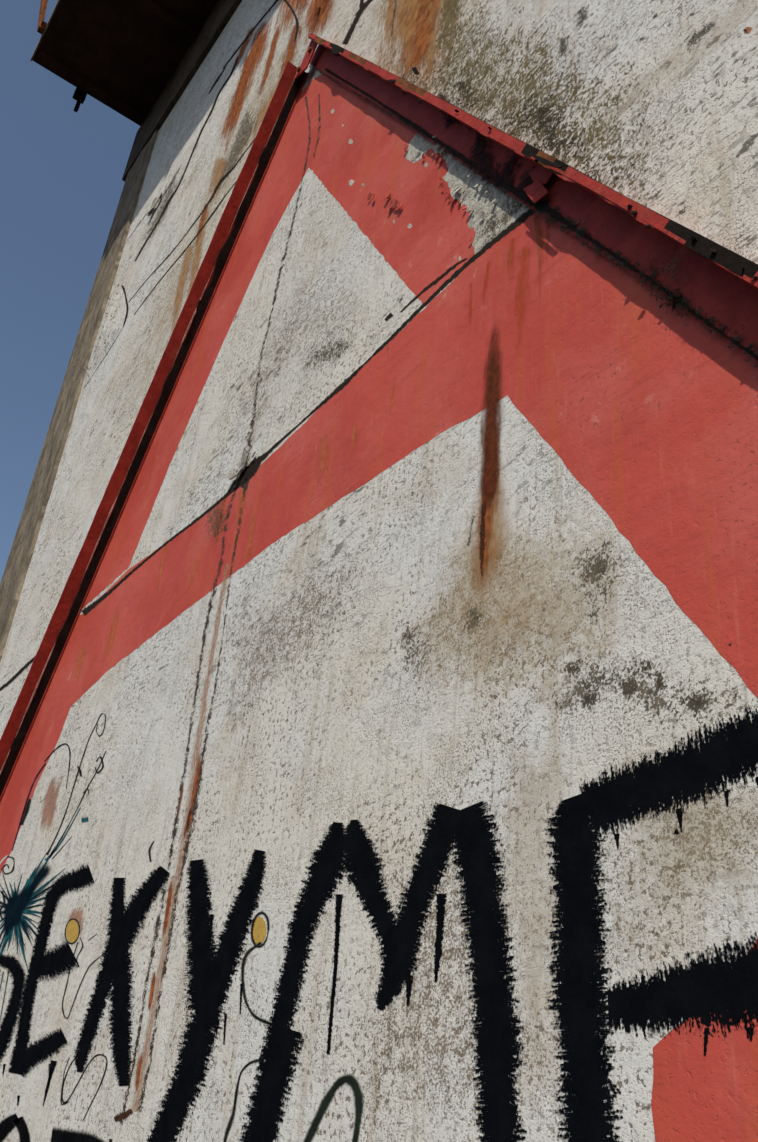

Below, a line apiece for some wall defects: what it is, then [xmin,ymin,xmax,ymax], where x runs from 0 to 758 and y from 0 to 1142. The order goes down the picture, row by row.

rust [172,158,226,329]
peeling [403,133,529,254]
rust [222,0,758,279]
mould [386,0,666,206]
spalling [557,1,605,56]
spalling [683,20,715,50]
rust [466,338,502,579]
crack [0,657,35,691]
crack [81,94,534,1142]
rust [463,607,484,635]